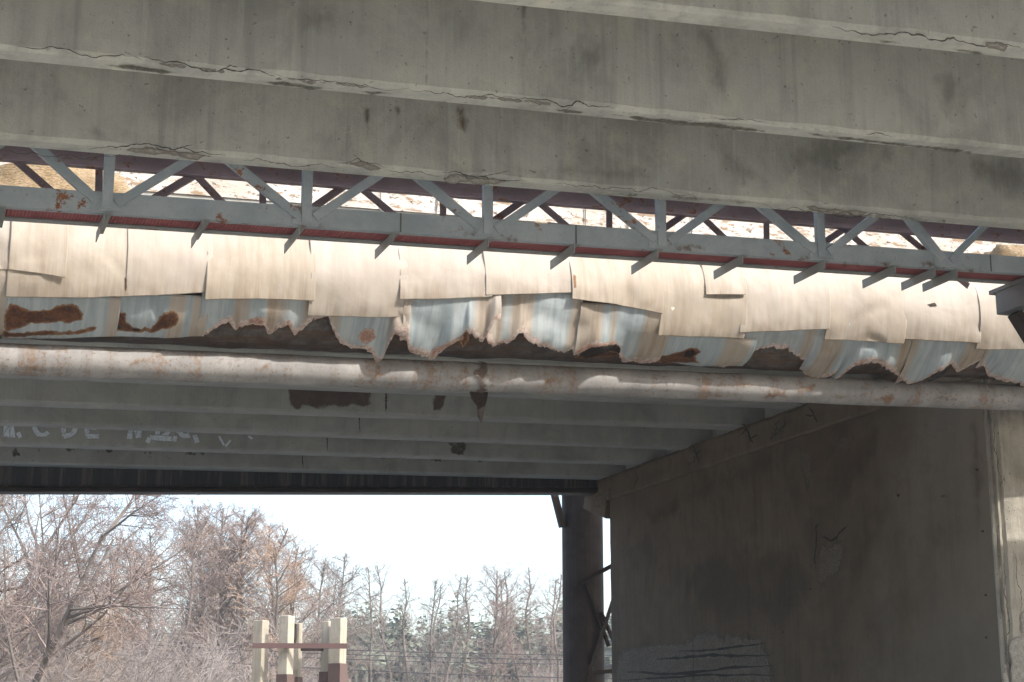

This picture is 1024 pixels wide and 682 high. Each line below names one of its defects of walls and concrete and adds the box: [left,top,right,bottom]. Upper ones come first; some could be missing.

crack [832,26,1022,49]
crack [19,46,615,111]
crack [0,143,220,159]
crack [245,155,523,181]
corrosion [2,304,96,338]
corrosion [117,311,179,333]
corrosion [575,341,622,355]
corrosion [656,348,701,364]
corrosion [289,390,370,409]